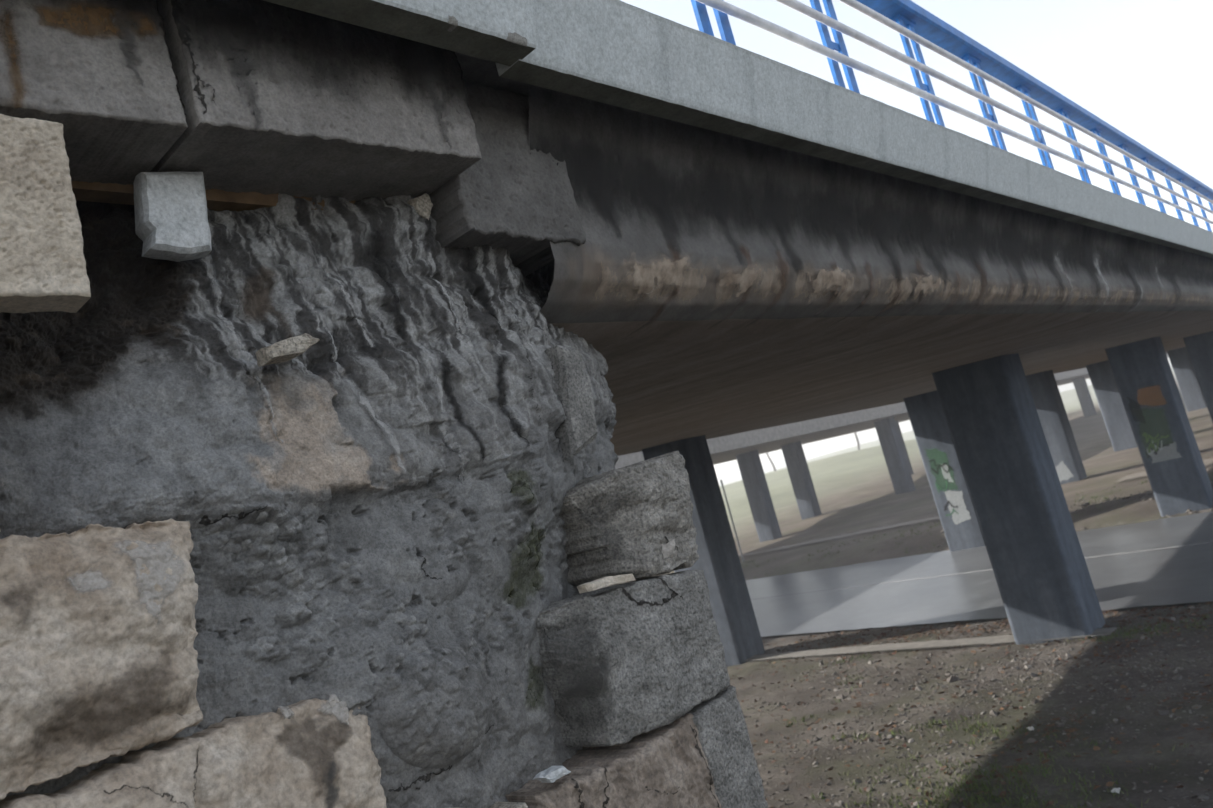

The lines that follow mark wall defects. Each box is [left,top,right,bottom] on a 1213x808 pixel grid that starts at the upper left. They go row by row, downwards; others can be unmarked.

corrosion [0,10,23,109]
corrosion [37,3,156,37]
crack [159,15,215,116]
damp [530,132,1213,318]
spalling [0,193,619,808]
spalling [662,539,676,559]
crack [104,752,199,805]
damp [278,719,350,808]
crack [571,766,609,808]
crack [645,725,719,807]